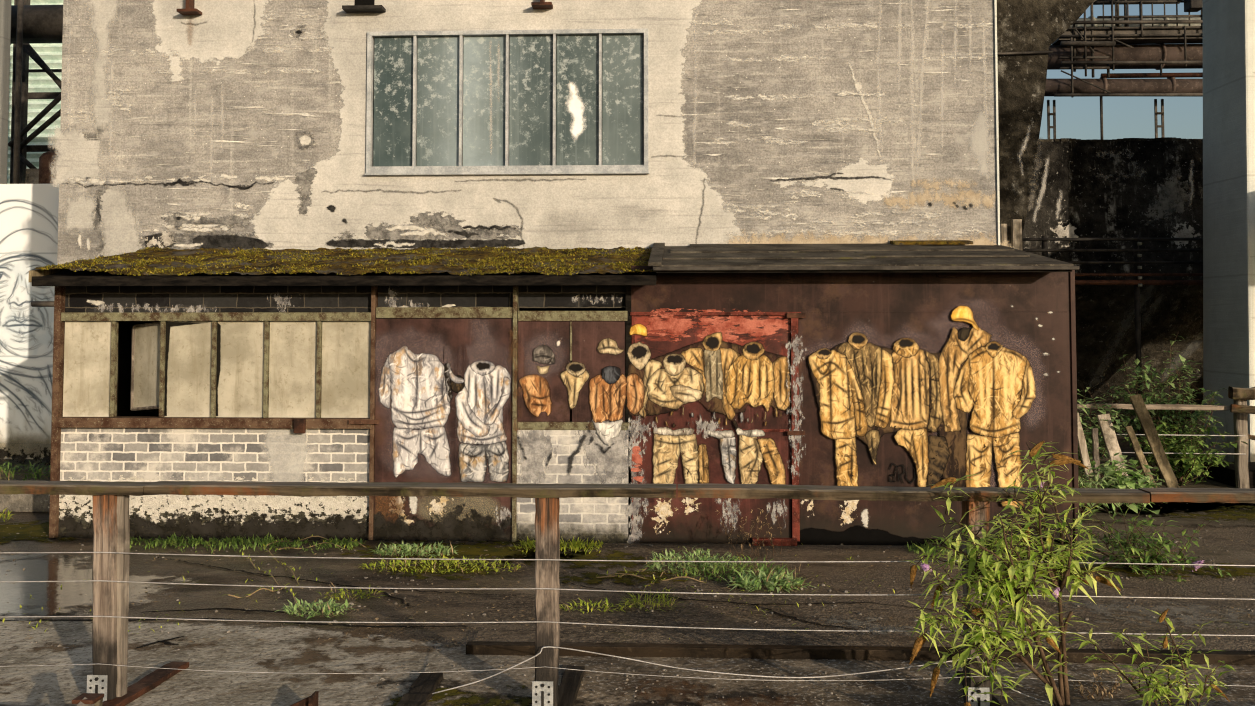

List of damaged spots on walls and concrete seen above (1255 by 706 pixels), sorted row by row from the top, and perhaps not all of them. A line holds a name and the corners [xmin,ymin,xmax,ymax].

peeling [50,0,992,257]
crack [67,174,285,257]
crack [696,179,705,244]
damp [1144,173,1192,227]
peeling [644,308,806,475]
damp [58,509,94,538]
damp [129,496,520,542]